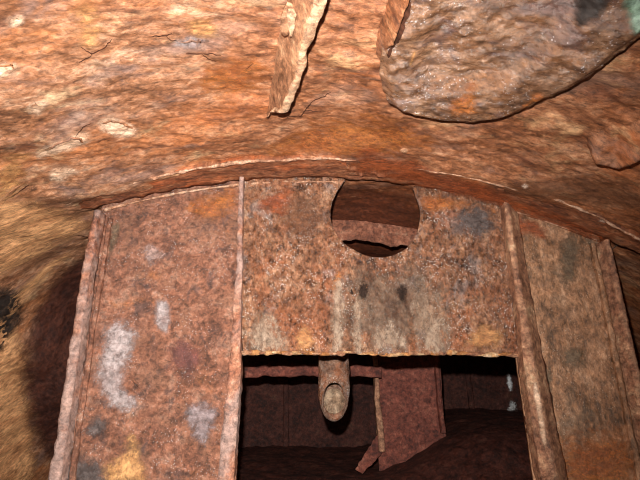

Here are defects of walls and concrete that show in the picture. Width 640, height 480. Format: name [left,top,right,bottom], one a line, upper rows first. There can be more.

crack [149,33,221,62]
peeling [266,0,327,118]
crack [287,92,331,118]
rust [270,115,605,242]
water stain [0,199,91,275]
rust [343,240,407,257]
water stain [332,266,448,353]
rust [297,328,313,347]
rust [469,328,503,347]
water stain [0,253,85,480]
rust [105,435,145,480]